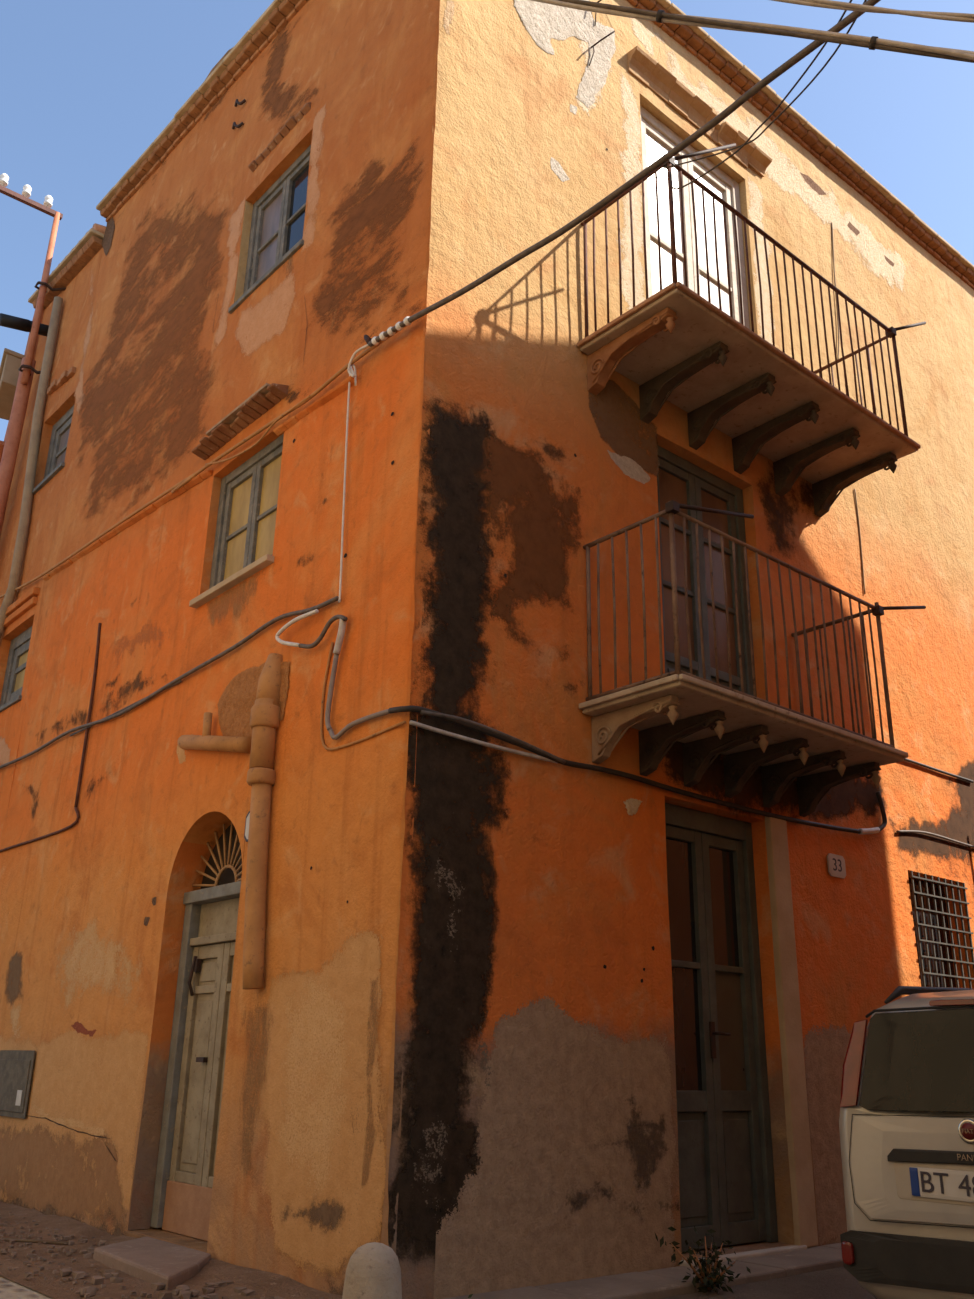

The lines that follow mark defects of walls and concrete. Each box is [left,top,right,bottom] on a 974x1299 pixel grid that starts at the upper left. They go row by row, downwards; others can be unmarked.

water stain [79,195,226,517]
water stain [314,146,422,333]
flaking render [512,0,646,310]
peeling [629,18,906,345]
water stain [758,466,818,551]
water stain [388,400,580,1261]
water stain [665,741,974,865]
water stain [362,982,376,1185]